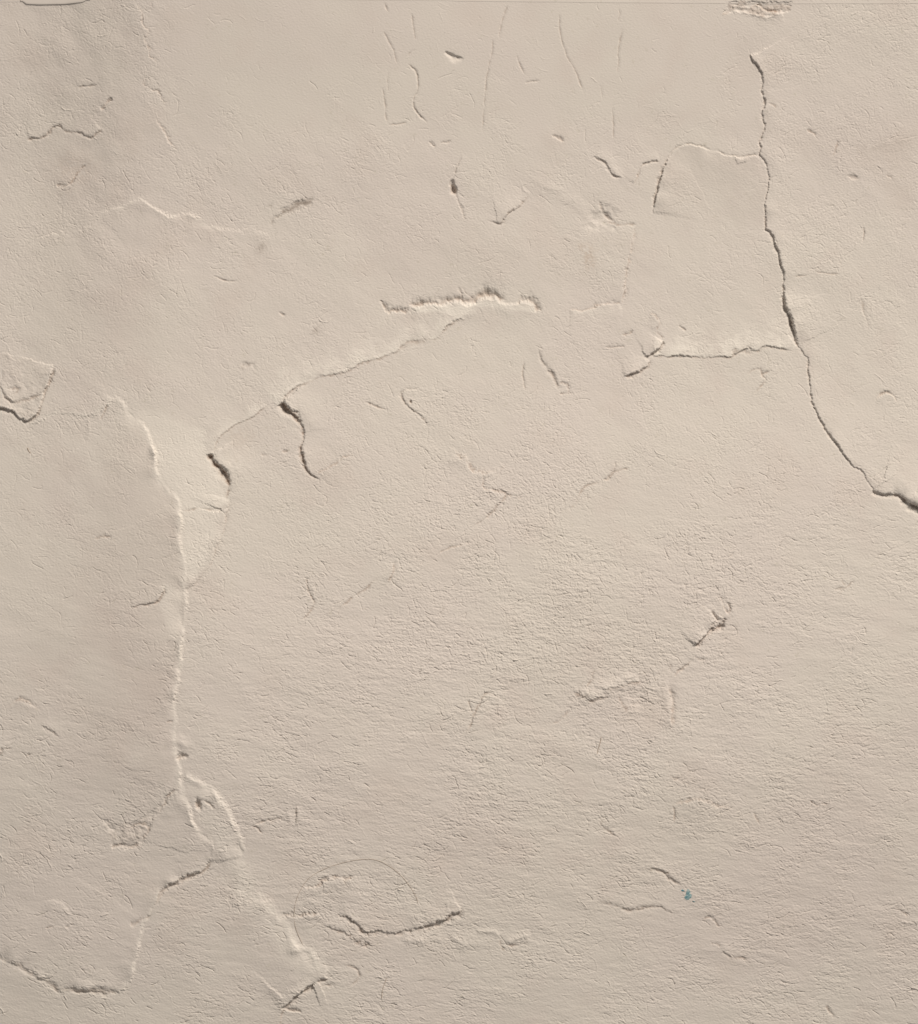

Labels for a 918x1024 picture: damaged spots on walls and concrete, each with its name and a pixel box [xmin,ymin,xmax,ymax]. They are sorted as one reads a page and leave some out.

crack [747,53,918,518]
crack [606,311,687,380]
peeling [0,351,56,424]
crack [260,397,353,484]
crack [335,900,465,949]
crack [277,975,328,1024]